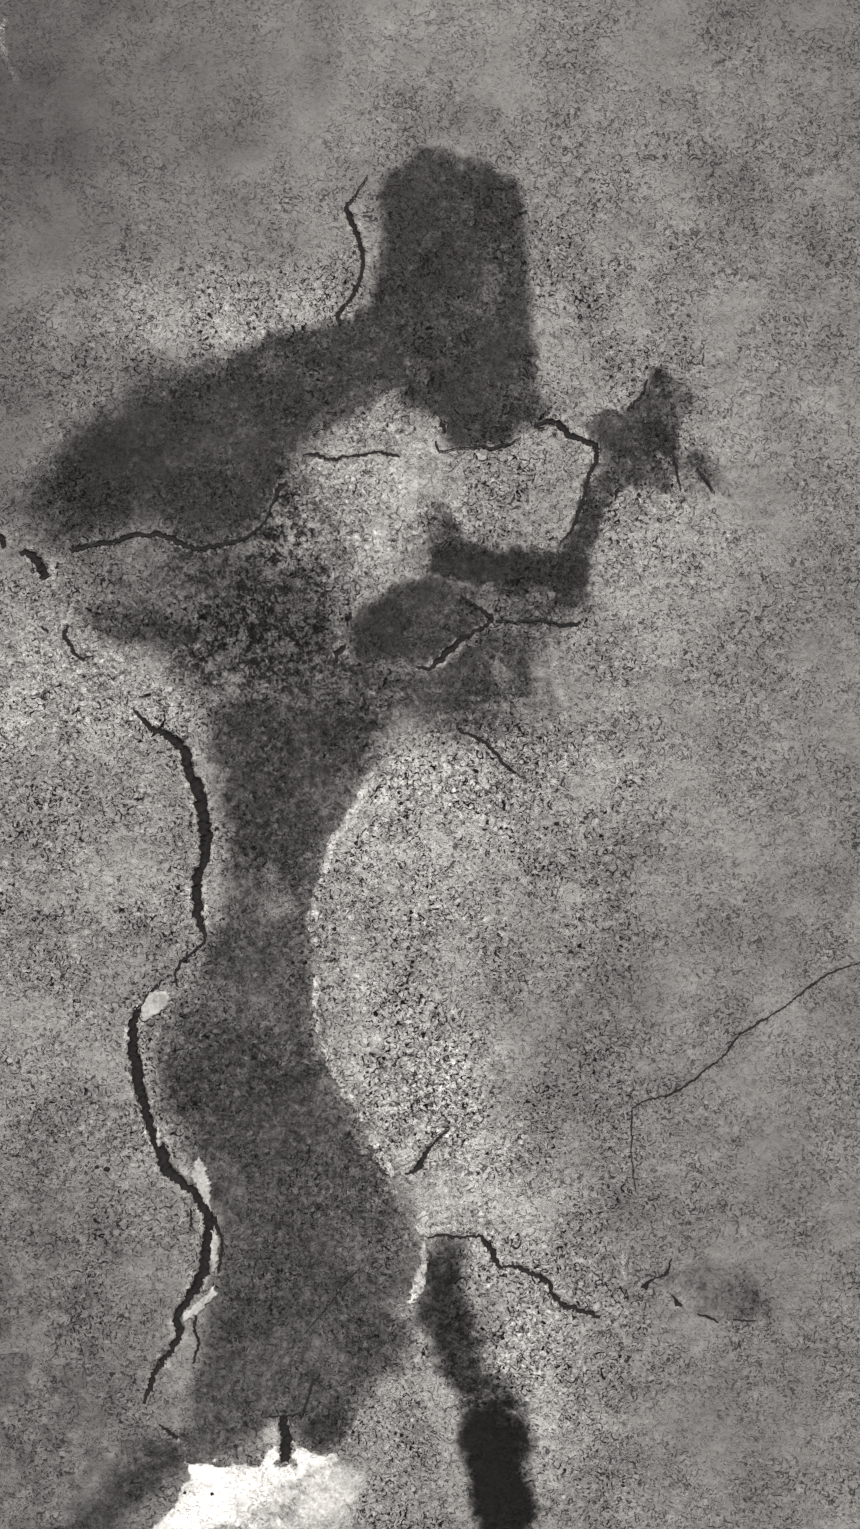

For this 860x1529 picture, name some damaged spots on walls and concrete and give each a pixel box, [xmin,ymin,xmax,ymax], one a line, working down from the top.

leakage [31,148,543,547]
crack [335,175,368,325]
crack [126,707,224,1440]
leakage [66,367,711,1529]
crack [428,1233,601,1319]
spalling [153,1446,354,1529]